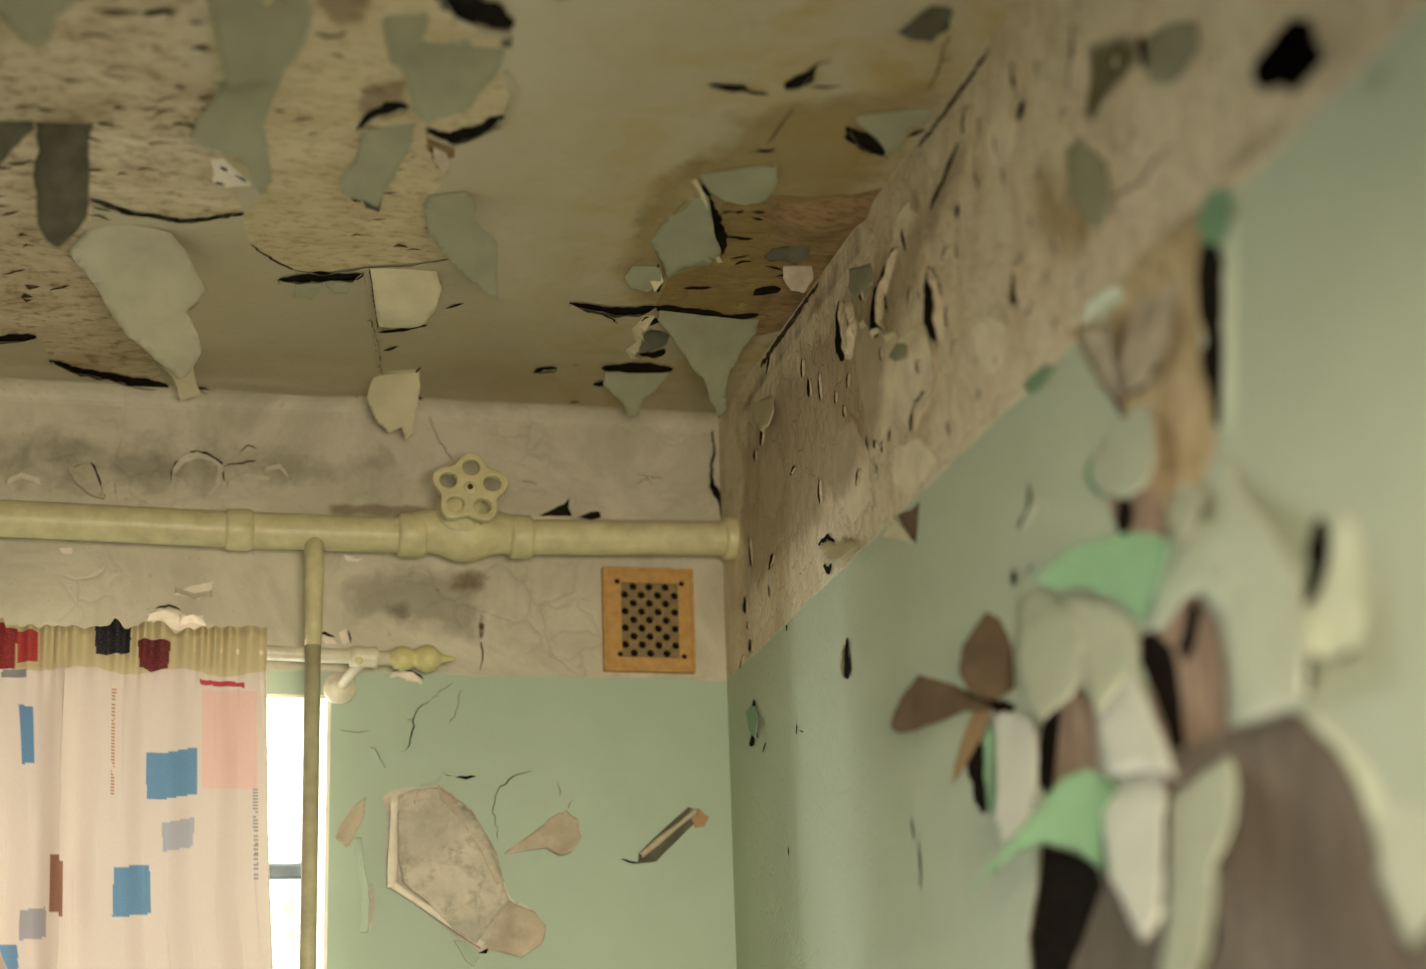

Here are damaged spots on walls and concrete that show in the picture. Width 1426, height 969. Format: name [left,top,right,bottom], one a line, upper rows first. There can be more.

peeling [898,6,953,43]
flaking render [0,0,521,400]
peeling [844,106,933,161]
peeling [985,105,1017,168]
peeling [818,263,938,574]
flaking render [891,183,1426,969]
peeling [335,775,581,966]
peeling [622,807,709,864]